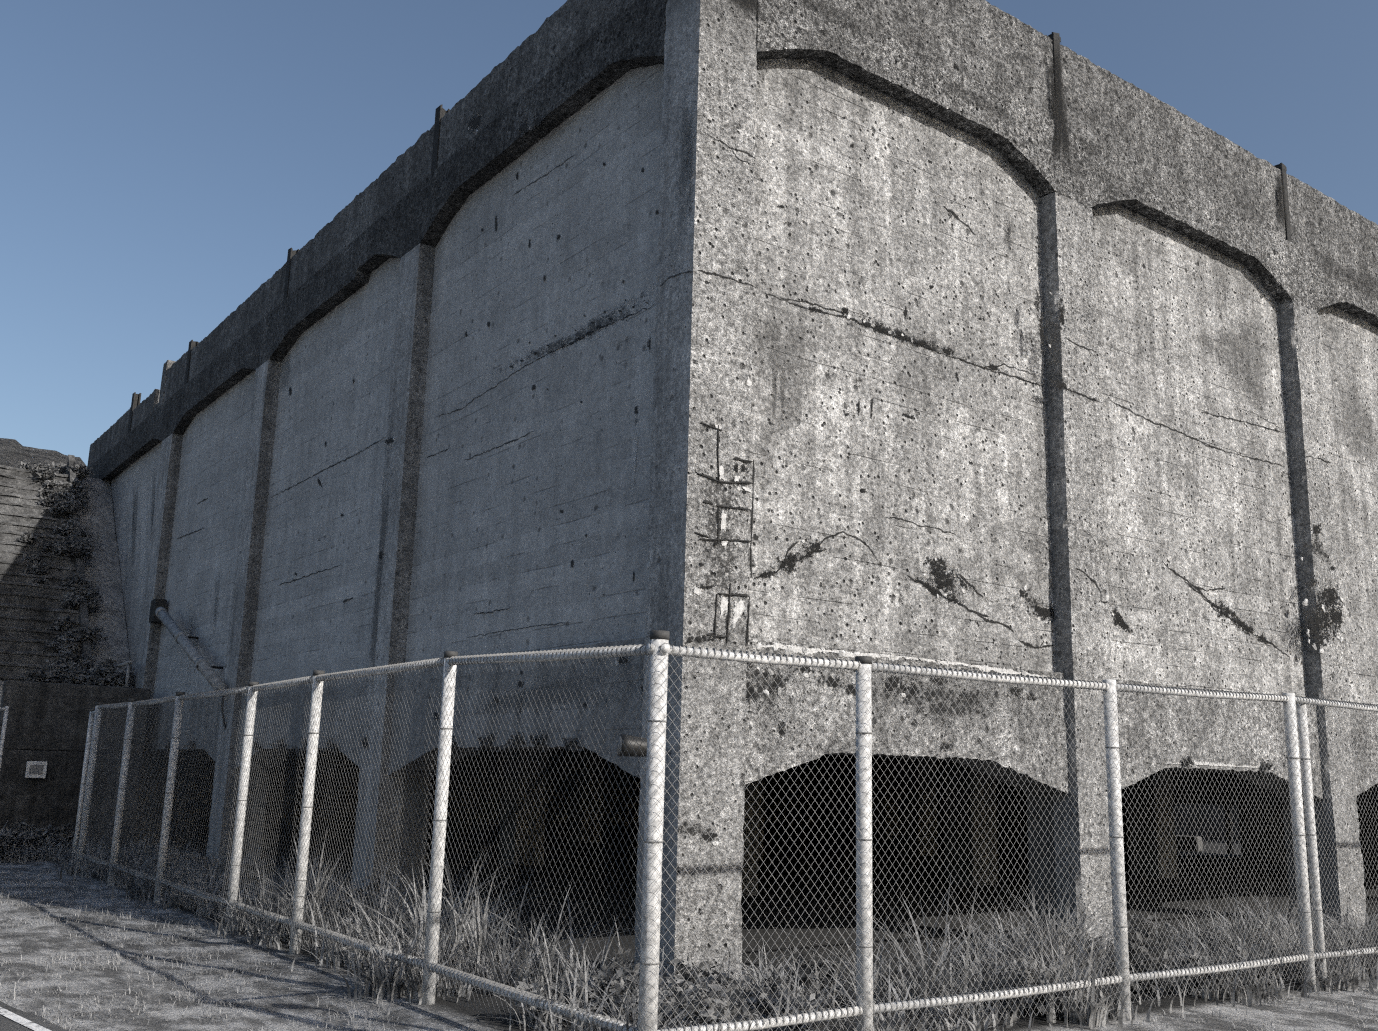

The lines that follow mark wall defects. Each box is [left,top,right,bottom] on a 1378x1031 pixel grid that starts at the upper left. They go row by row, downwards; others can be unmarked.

crack [428,270,1331,466]
crack [754,517,956,579]
spalling [685,422,1047,752]
crack [907,573,1053,648]
spalling [1018,585,1054,625]
crack [1162,561,1290,657]
spalling [1300,522,1346,654]